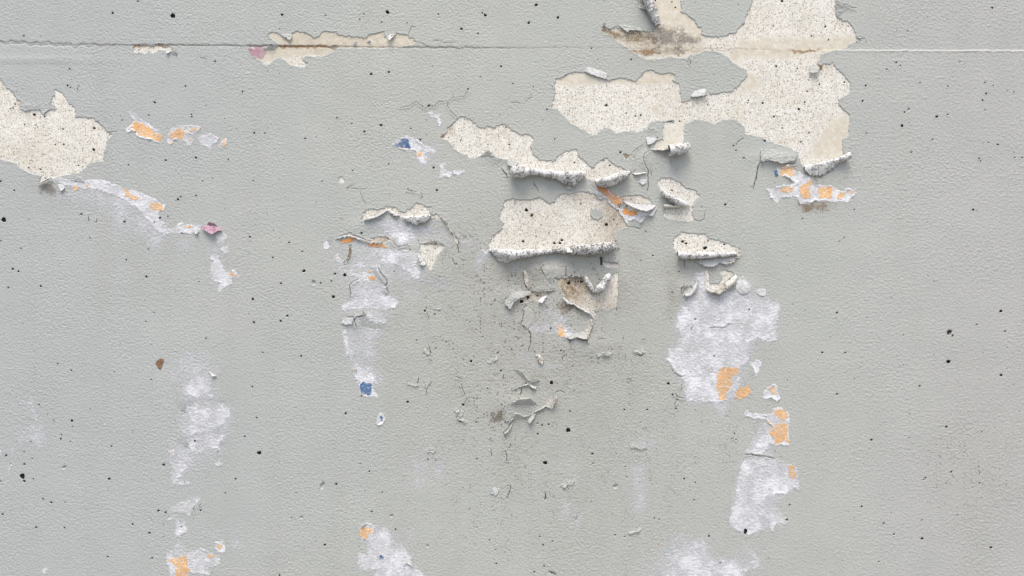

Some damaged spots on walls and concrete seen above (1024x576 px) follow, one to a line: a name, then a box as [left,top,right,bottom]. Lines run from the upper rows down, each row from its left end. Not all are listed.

peeling [0,79,113,191]
peeling [248,31,416,67]
peeling [551,0,862,181]
peeling [335,233,389,261]
peeling [362,203,458,269]
peeling [442,117,741,340]